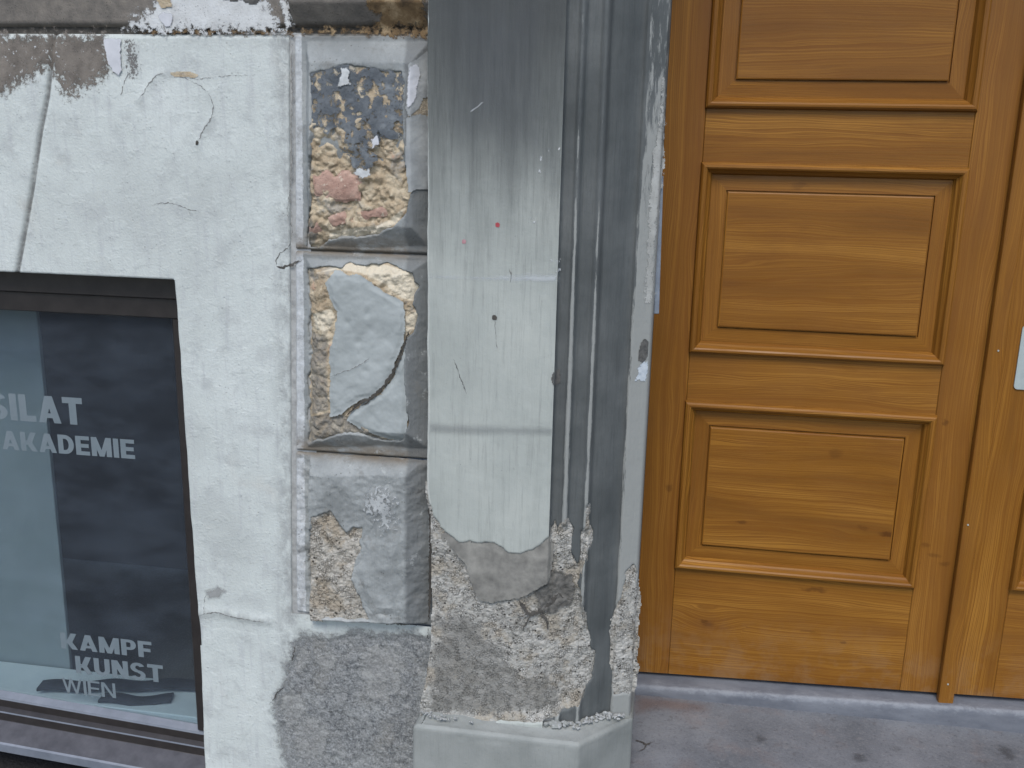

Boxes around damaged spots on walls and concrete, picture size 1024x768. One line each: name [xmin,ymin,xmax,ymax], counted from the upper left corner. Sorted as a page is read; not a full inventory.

peeling [0,0,293,102]
crack [187,79,214,145]
flaking render [308,51,428,247]
flaking render [308,262,419,442]
crack [345,331,409,417]
flaking render [273,481,595,768]
flaking render [609,564,642,694]